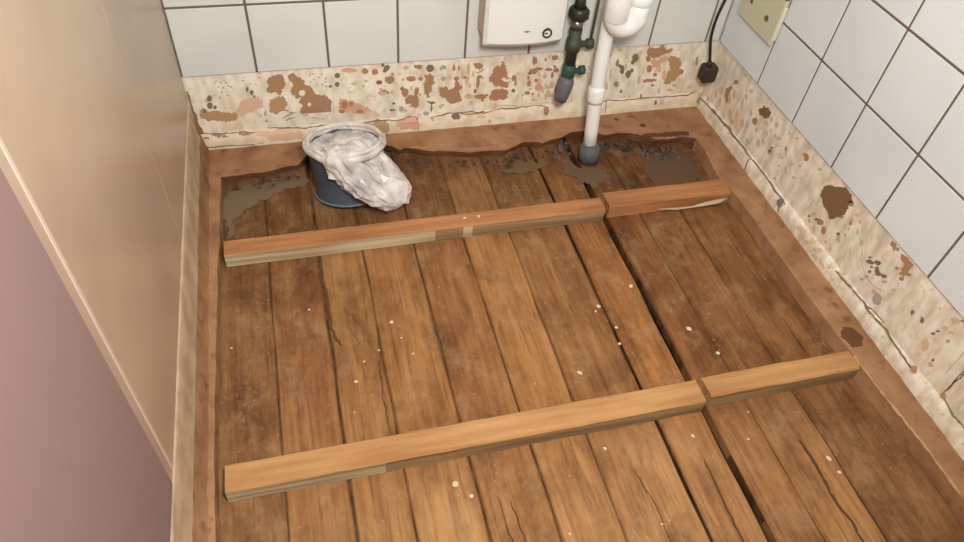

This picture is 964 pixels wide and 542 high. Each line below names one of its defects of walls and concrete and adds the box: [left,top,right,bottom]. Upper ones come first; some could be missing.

spalling [199,95,238,122]
spalling [266,73,340,120]
spalling [362,63,486,112]
spalling [511,56,559,95]
spalling [610,45,684,93]
damp [500,160,612,188]
damp [643,150,701,187]
damp [223,177,309,239]
spalling [808,185,854,236]
spalling [866,241,914,278]
crack [835,241,911,369]
crack [944,352,964,428]